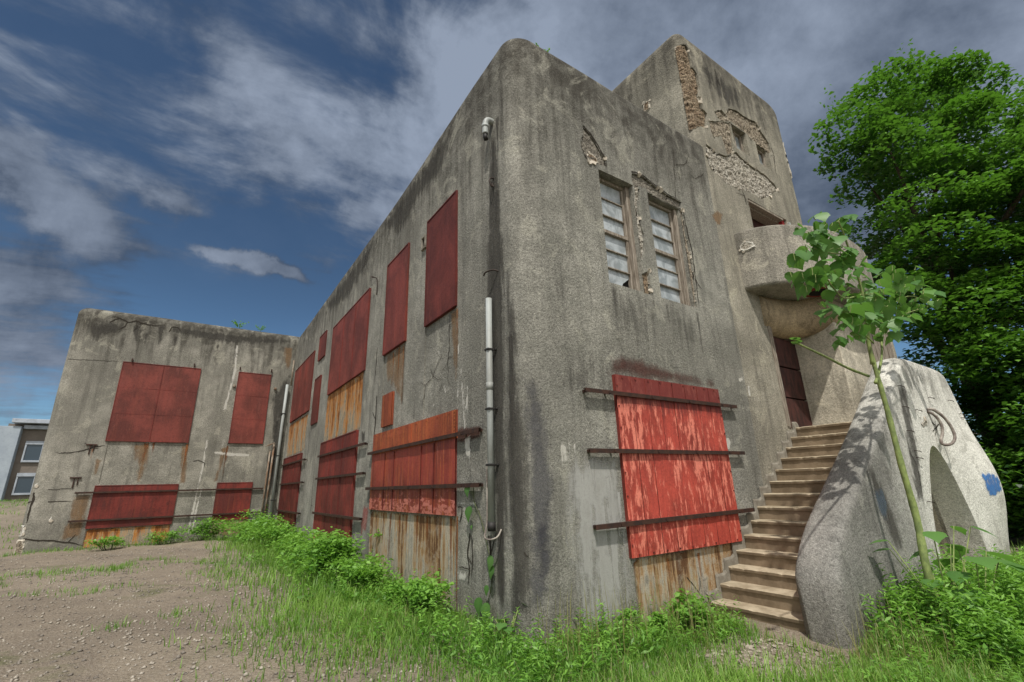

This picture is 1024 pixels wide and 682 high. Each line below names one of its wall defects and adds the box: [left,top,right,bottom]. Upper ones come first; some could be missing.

spalling [674,45,779,199]
spalling [632,171,679,294]
crack [110,316,181,332]
water stain [92,323,284,348]
water stain [487,117,550,612]
rust [368,511,458,609]
rust [634,543,733,625]